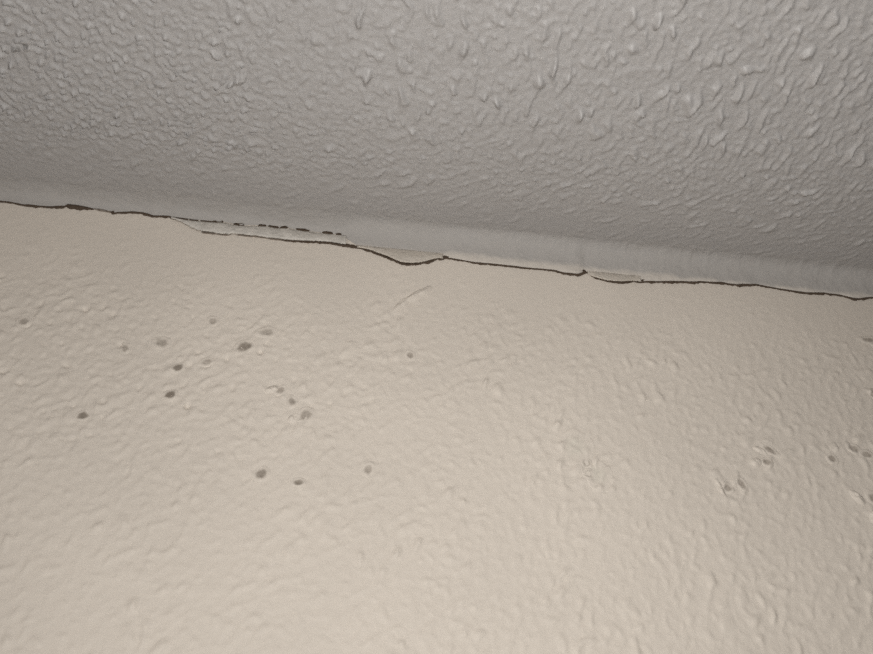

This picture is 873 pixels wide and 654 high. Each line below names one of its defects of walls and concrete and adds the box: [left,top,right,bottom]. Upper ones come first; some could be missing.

crack [0,201,873,301]